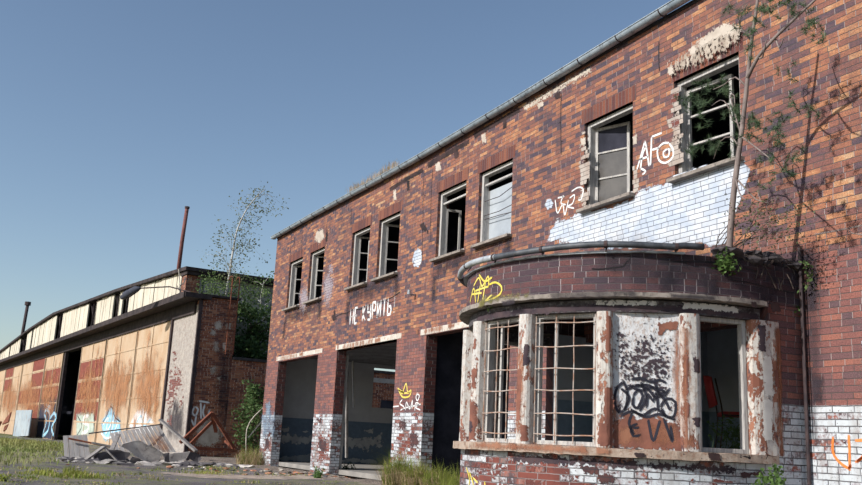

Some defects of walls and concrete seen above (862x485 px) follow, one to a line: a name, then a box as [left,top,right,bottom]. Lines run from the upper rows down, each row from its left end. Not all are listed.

spalling [666,23,742,76]
spalling [667,86,684,167]
peeling [683,302,739,314]
peeling [595,300,678,393]
corrosion [0,372,58,420]
corrosion [77,335,160,436]
flaking render [166,351,184,425]
peeling [263,417,333,463]
peeling [342,428,384,464]
peeling [395,419,421,461]
peeling [469,368,478,441]
peeling [473,387,764,485]